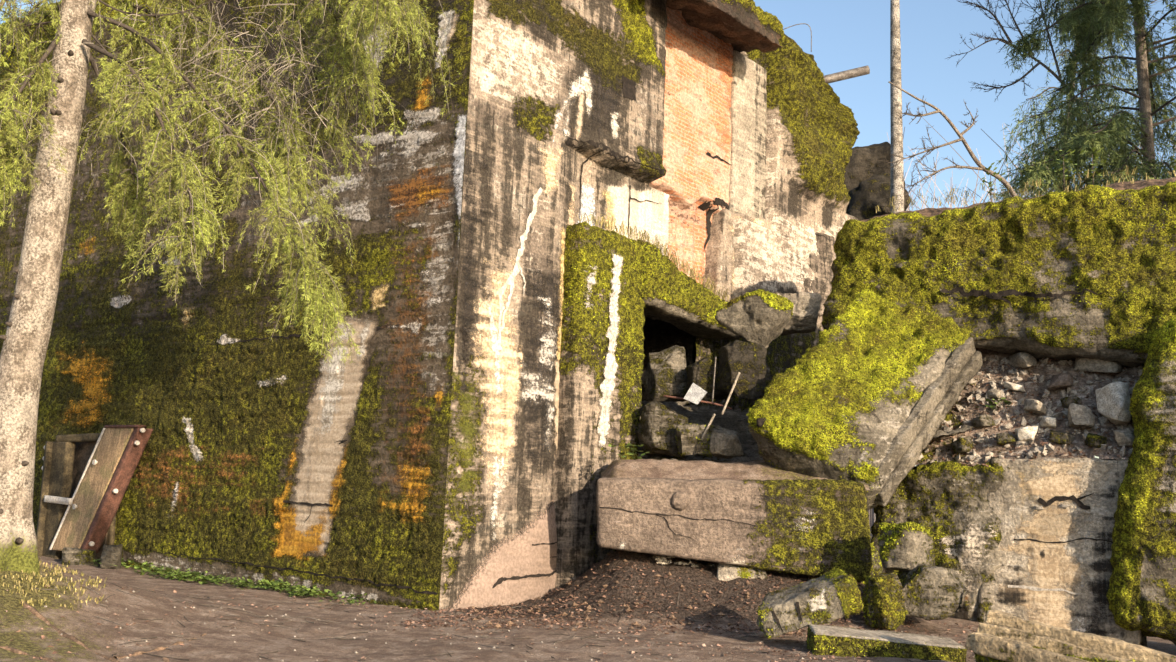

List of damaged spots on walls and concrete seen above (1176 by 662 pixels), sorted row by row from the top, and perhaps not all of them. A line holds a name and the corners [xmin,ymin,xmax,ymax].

spalling [715,37,733,157]
water stain [425,69,623,538]
crack [599,507,774,542]
crack [1014,536,1113,544]
crack [1037,493,1094,510]
crack [493,542,558,588]